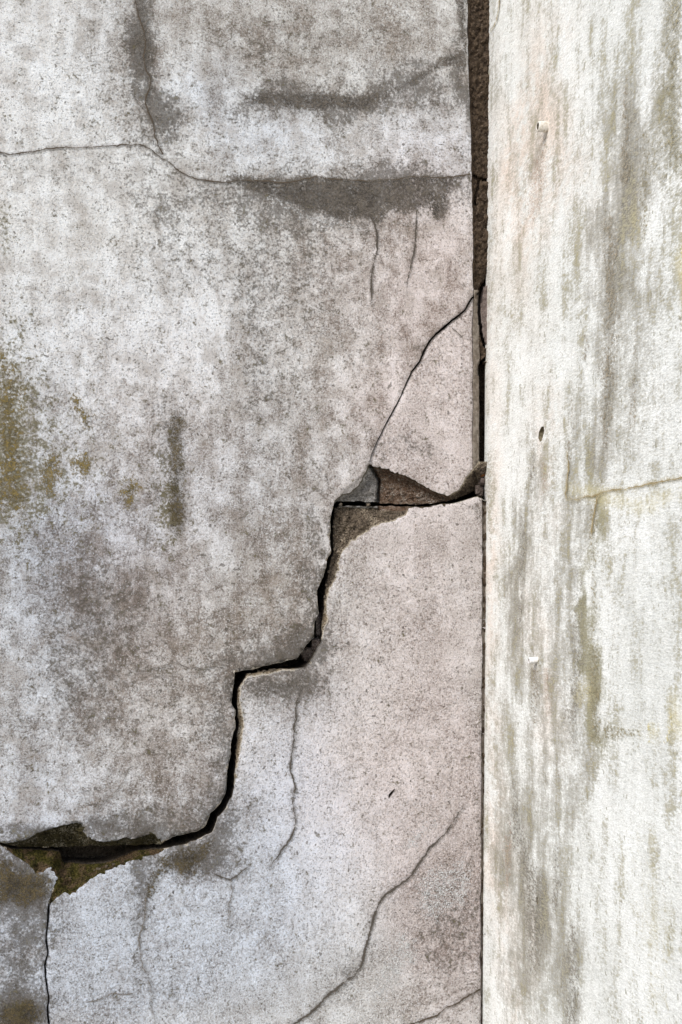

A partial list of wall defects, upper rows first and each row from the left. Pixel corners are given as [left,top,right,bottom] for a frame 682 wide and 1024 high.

crack [0,0,470,184]
damp [226,173,464,232]
damp [620,1,682,234]
crack [371,267,487,455]
damp [598,217,620,444]
spalling [327,464,451,586]
damp [564,509,639,743]
crack [0,462,487,1024]
damp [509,780,561,975]